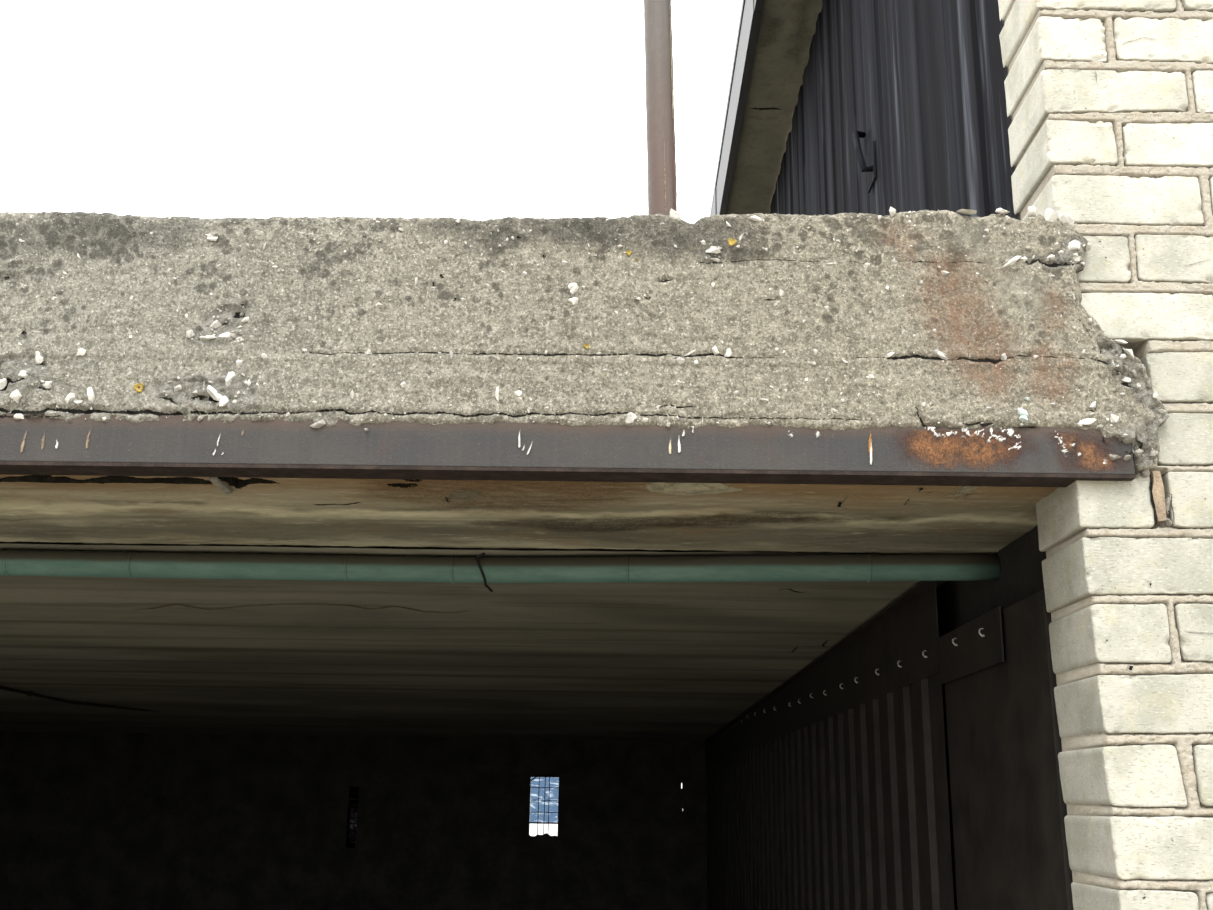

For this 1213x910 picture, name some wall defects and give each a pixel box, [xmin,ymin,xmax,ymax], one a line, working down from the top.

spalling [168,214,268,276]
spalling [444,209,778,313]
spalling [305,378,330,428]
spalling [343,349,458,431]
crack [308,351,773,359]
spalling [506,357,585,423]
spalling [598,333,732,429]
spalling [734,348,891,419]
spalling [905,334,959,369]
crack [856,347,1111,392]
spalling [1033,340,1169,464]
rust [908,431,1023,461]